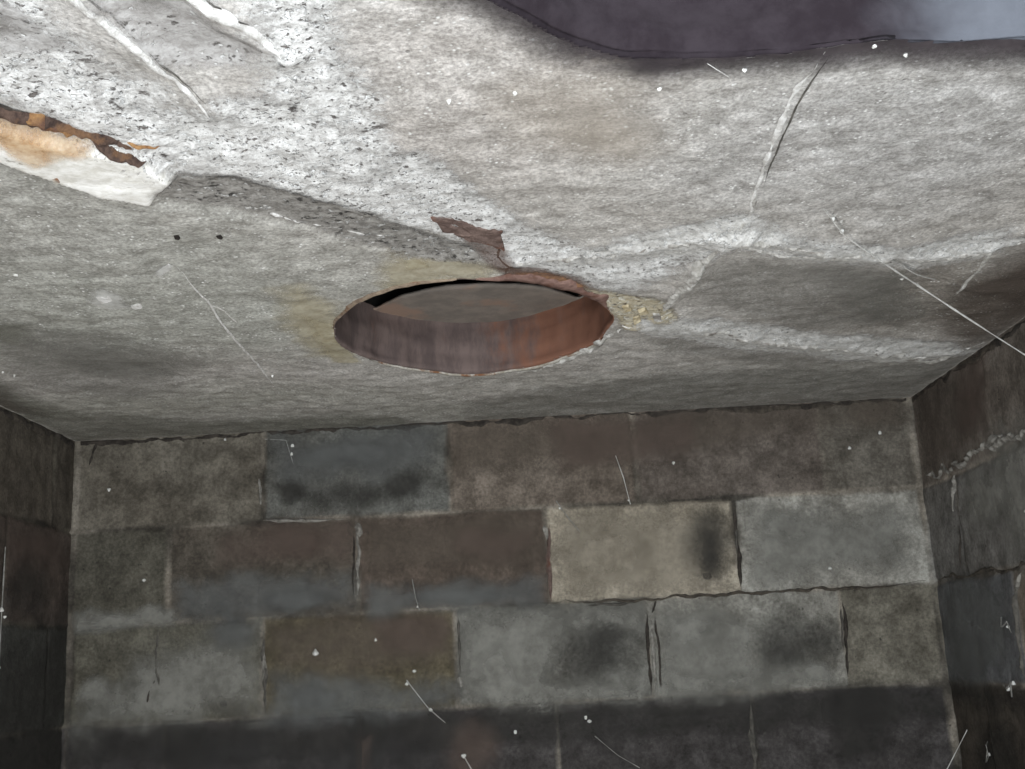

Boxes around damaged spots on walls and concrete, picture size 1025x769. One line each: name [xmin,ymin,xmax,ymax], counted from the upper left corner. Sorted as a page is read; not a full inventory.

peeling [0,2,59,54]
peeling [96,0,257,66]
rust [0,104,159,168]
spalling [0,127,481,262]
rust [431,216,609,309]
damp [291,294,357,363]
rust [333,278,457,329]